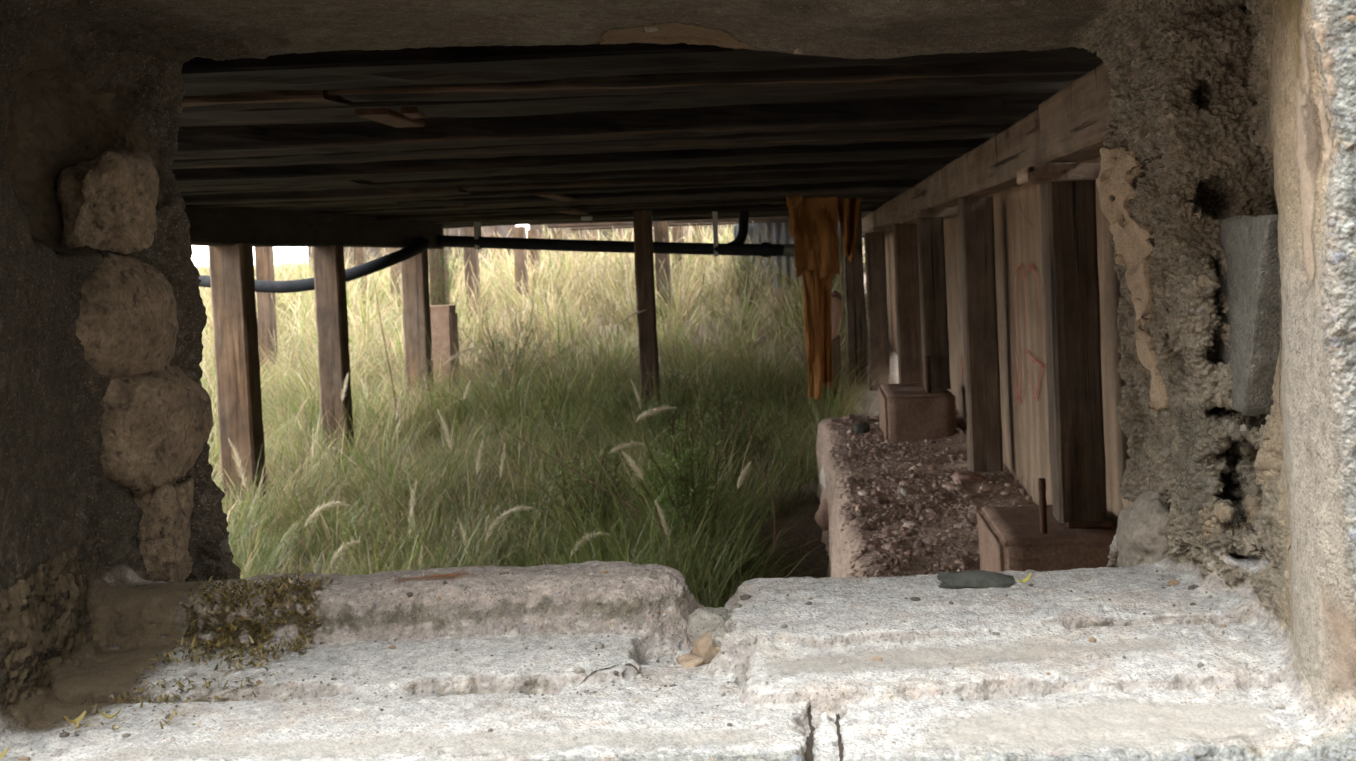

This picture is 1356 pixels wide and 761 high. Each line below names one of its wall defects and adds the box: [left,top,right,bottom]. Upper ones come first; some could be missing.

flaking render [1096,147,1170,413]
flaking render [1201,287,1283,538]
crack [804,703,844,761]